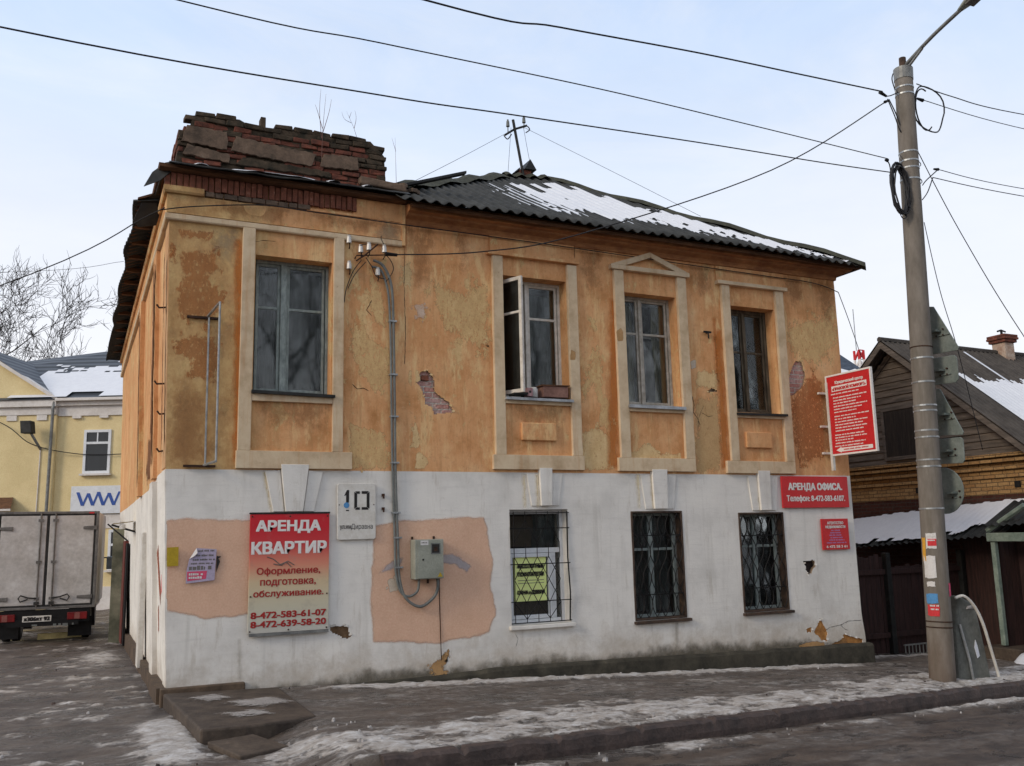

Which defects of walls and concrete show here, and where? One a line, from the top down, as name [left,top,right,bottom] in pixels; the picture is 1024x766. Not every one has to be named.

flaking render [416,370,455,414]
peeling [787,302,838,468]
spalling [803,560,817,576]
peeling [329,624,352,639]
peeling [799,618,863,647]
peeling [428,649,450,676]